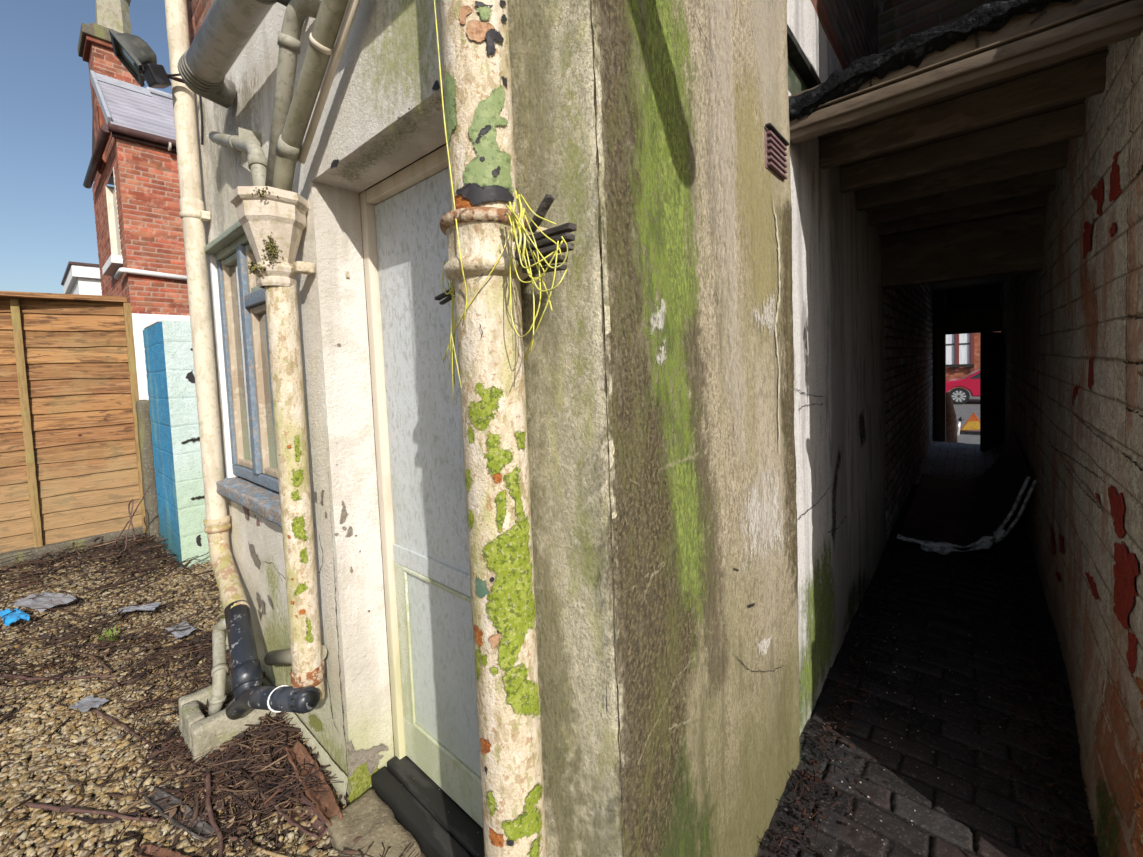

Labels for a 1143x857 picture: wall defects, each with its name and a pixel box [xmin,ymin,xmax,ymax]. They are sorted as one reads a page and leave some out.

peeling [475,0,507,22]
peeling [432,72,514,206]
crack [1074,48,1143,471]
damp [590,0,729,857]
crack [1052,446,1105,512]
flaking render [249,544,261,570]
flaking render [256,592,273,618]
spalling [1085,485,1143,709]
flaking render [345,740,389,777]